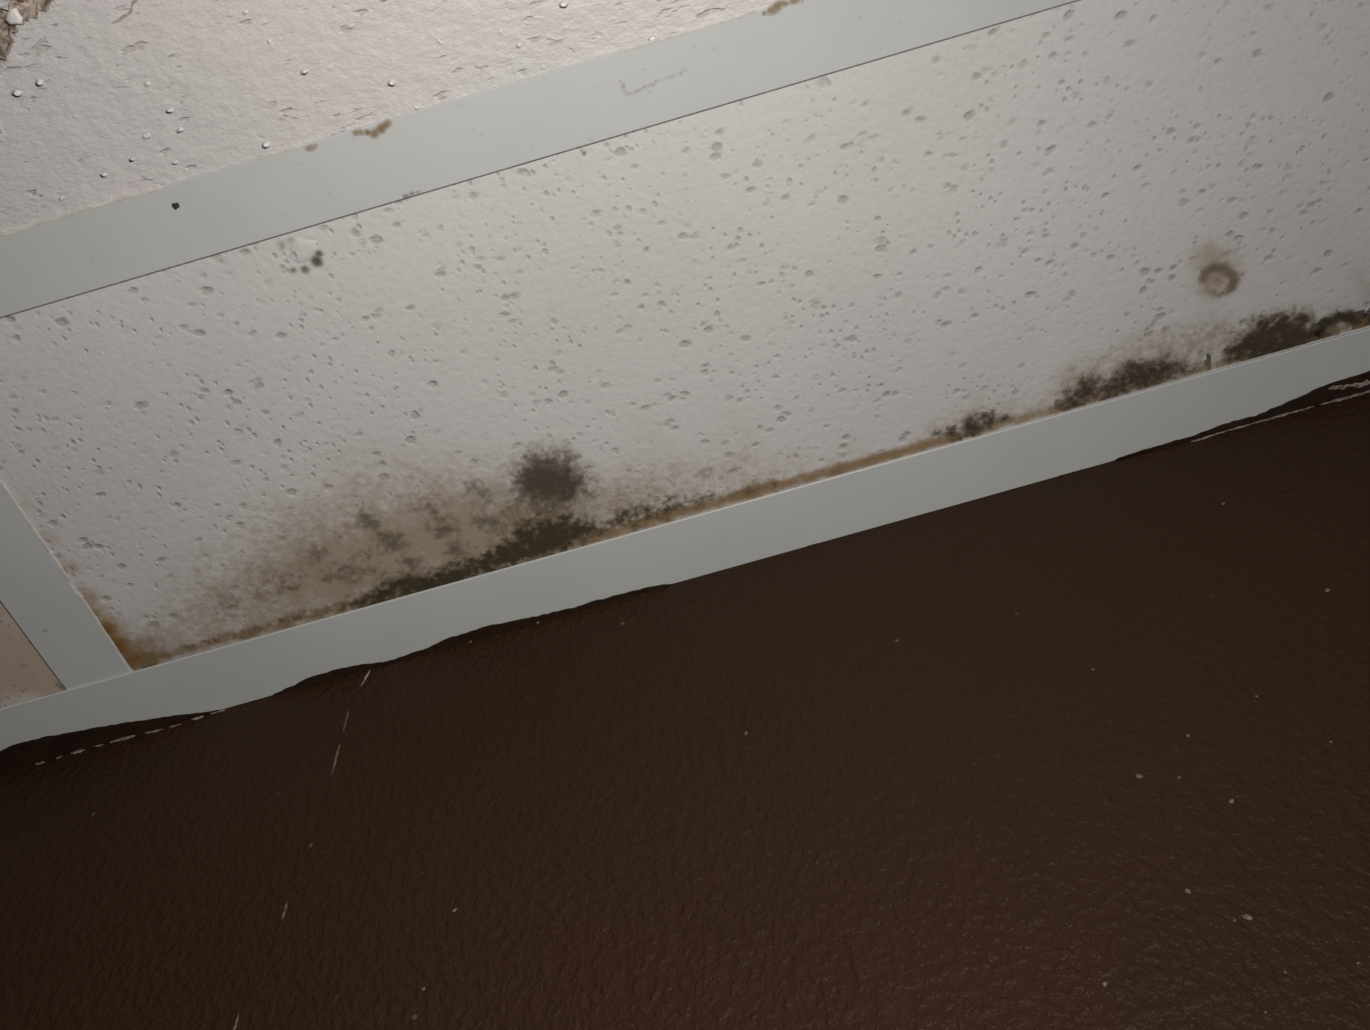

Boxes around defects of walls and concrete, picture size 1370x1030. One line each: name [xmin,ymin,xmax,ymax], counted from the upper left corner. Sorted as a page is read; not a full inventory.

crack [0,0,52,61]
crack [113,0,137,23]
leakage [1201,259,1239,293]
leakage [136,310,1370,665]
leakage [0,601,66,699]